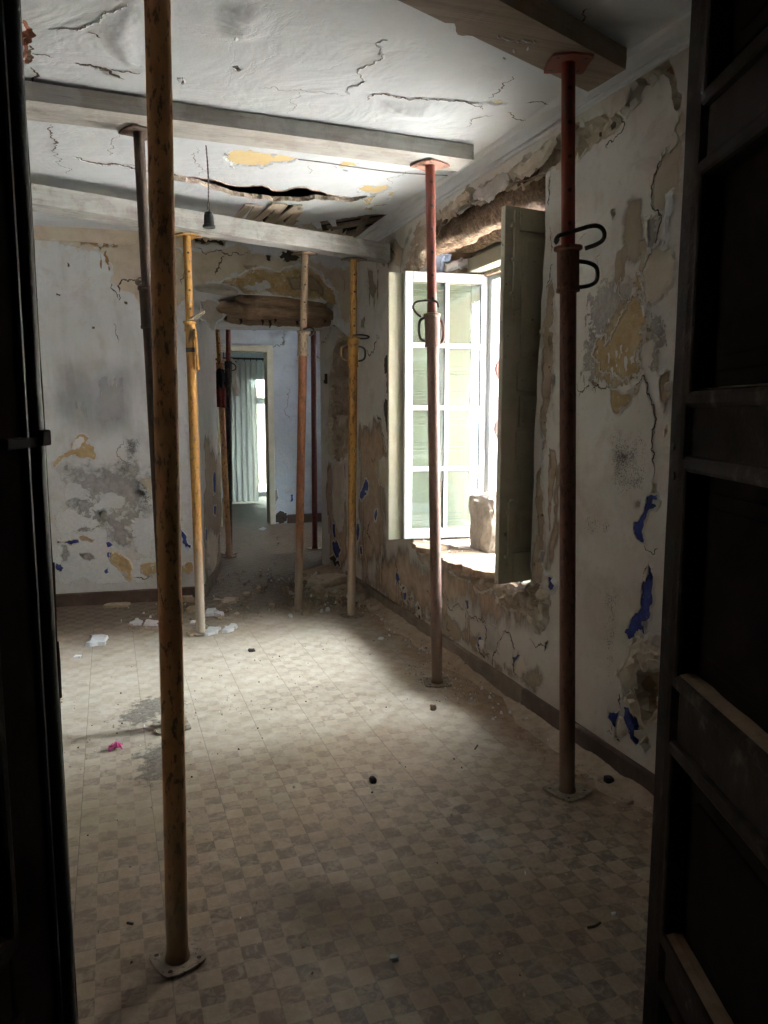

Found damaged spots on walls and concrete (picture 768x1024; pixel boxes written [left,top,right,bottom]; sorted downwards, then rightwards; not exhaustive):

crack [55,4,128,38]
crack [75,63,140,80]
crack [258,40,549,127]
peeling [52,239,141,306]
spalling [404,133,561,274]
peeling [575,59,686,416]
crack [641,150,664,269]
peeling [175,237,387,579]
damp [65,439,151,546]
crack [395,559,547,679]
spalling [416,552,559,651]
spalling [607,561,661,753]